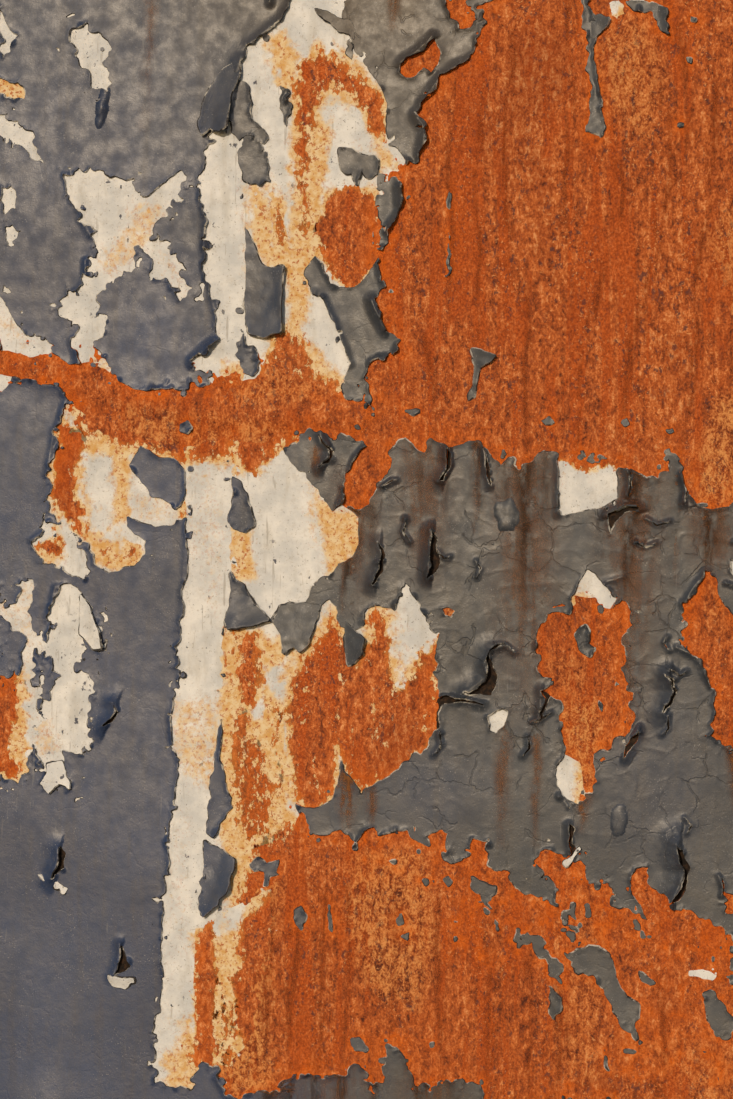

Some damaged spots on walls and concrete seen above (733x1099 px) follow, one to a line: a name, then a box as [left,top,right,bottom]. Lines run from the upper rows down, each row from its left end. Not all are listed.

peeling [0,78,43,162]
peeling [0,286,53,357]
peeling [50,0,405,393]
corrosion [0,0,733,519]
peeling [0,404,501,1089]
peeling [488,709,507,733]
peeling [556,746,591,808]
corrosion [535,587,639,815]
peeling [571,570,616,609]
peeling [558,453,639,530]
corrosion [679,571,733,771]
corrosion [218,795,733,1099]